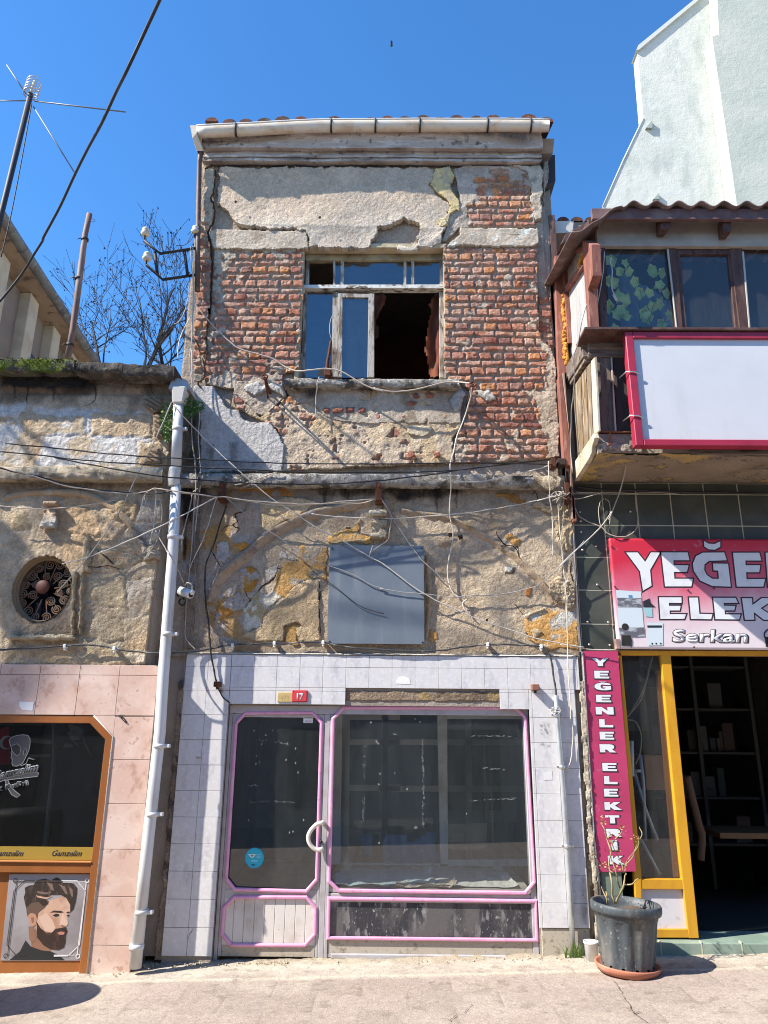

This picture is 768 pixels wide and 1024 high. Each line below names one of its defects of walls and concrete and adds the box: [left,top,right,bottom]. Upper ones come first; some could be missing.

crack [193,164,220,388]
spalling [193,165,560,471]
spalling [215,541,250,563]
crack [212,509,262,566]
spalling [238,488,320,532]
spalling [238,518,374,645]
peeling [523,576,579,651]